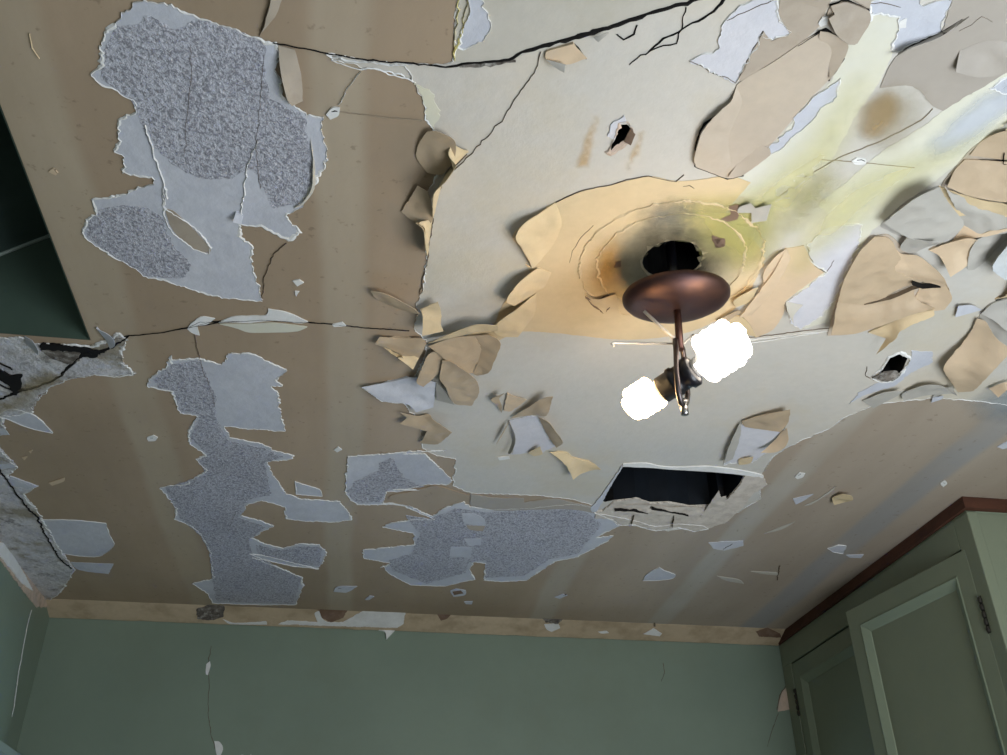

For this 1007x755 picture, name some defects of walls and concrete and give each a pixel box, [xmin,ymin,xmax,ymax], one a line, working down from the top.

crack [273,0,725,170]
damp [713,216,752,246]
flaking render [0,327,136,436]
crack [118,243,409,406]
peeling [82,0,1007,625]
flaking render [0,448,115,600]
peeling [279,595,405,640]
flaking render [543,618,563,632]